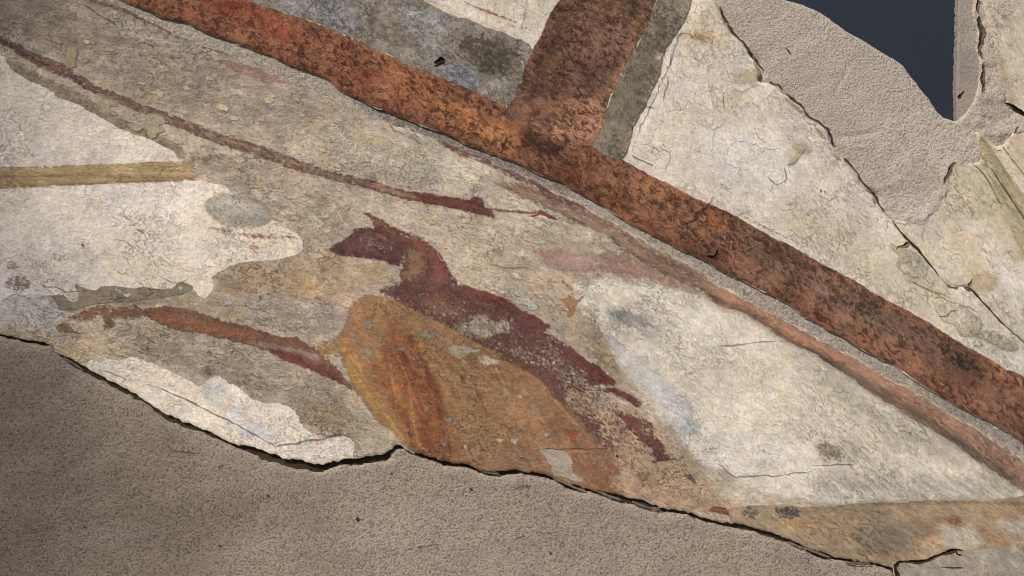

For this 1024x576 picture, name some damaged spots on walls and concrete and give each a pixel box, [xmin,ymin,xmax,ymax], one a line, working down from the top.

crack [720,0,1024,342]
crack [0,334,963,576]